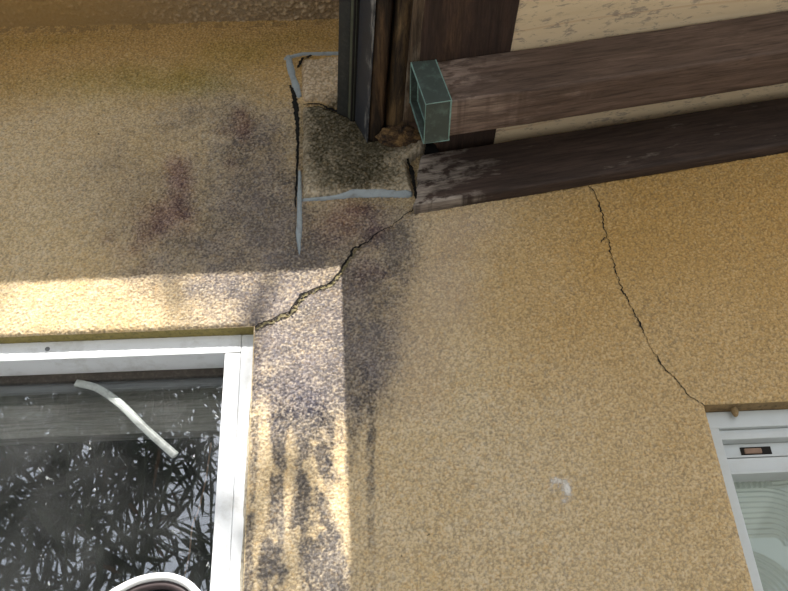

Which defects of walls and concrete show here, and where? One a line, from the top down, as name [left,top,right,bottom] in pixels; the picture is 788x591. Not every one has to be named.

crack [289,55,337,207]
crack [255,158,417,330]
crack [588,185,704,405]